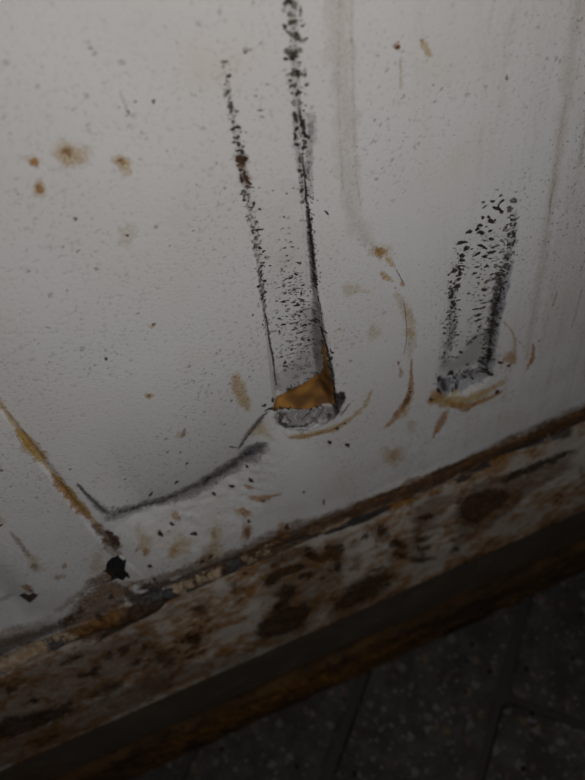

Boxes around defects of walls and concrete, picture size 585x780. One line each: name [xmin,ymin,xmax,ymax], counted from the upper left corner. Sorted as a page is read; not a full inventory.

damp [299,121,318,289]
corrosion [387,360,414,426]
corrosion [429,385,502,436]
crack [78,446,263,518]
corrosion [0,405,585,655]
peeling [105,555,130,581]